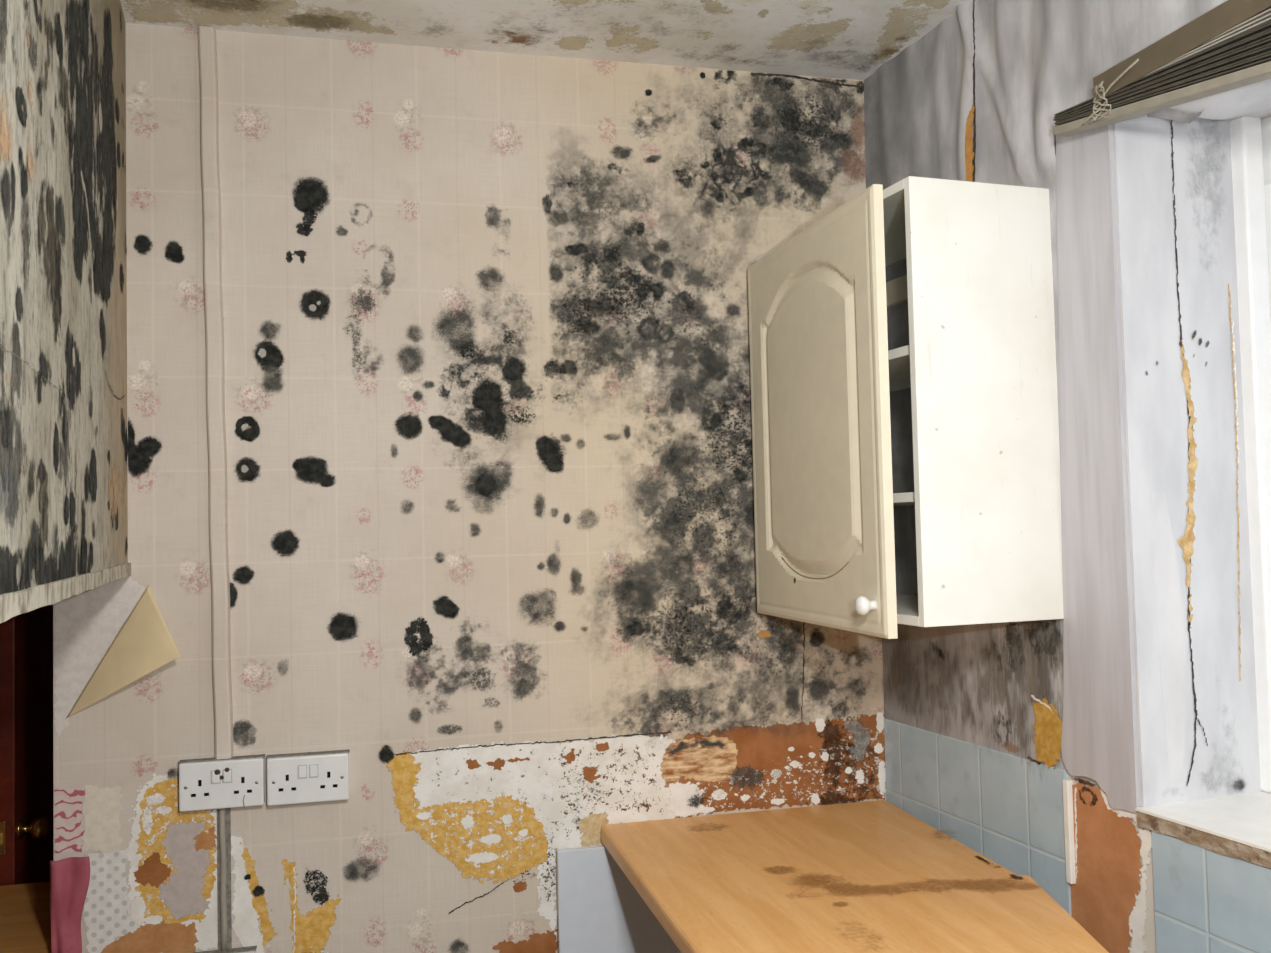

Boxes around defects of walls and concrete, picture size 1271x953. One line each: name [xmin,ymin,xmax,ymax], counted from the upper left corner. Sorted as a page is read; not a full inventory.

water stain [0,0,184,595]
water stain [286,177,329,264]
water stain [674,56,869,217]
water stain [292,456,335,487]
water stain [392,146,870,738]
crack [1170,120,1208,786]
crack [1228,284,1241,681]
peeling [66,585,180,718]
peeling [1006,693,1062,769]
peeling [101,773,341,953]
peeling [386,712,886,953]
flaking render [1070,778,1152,953]